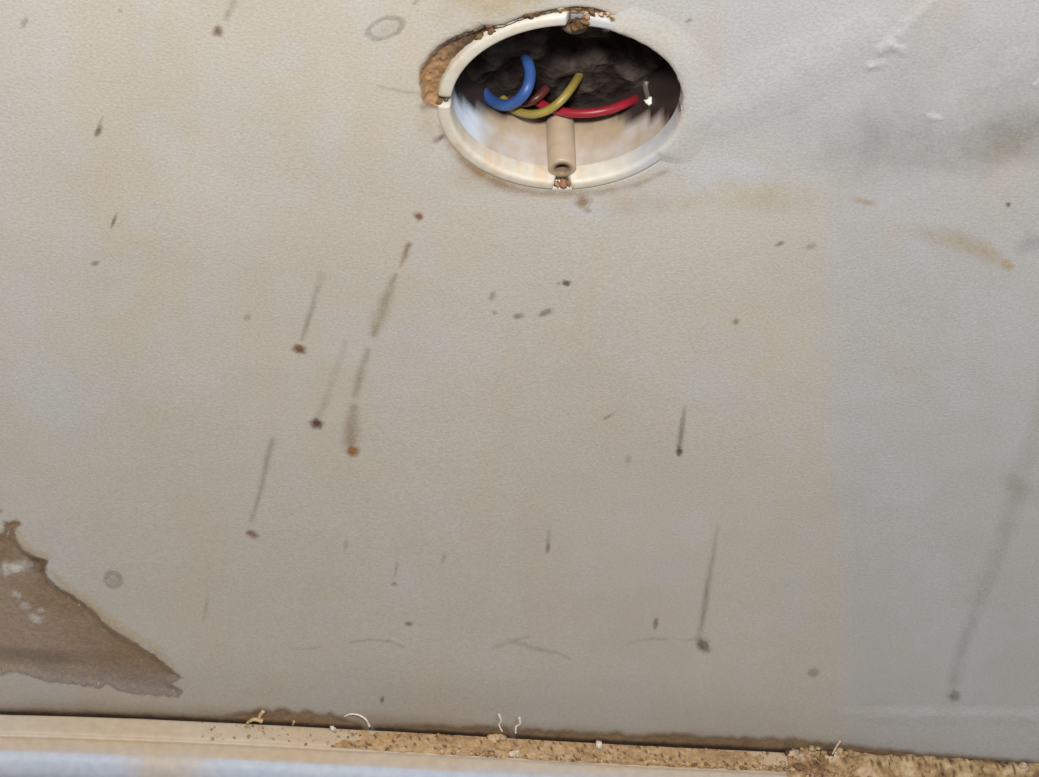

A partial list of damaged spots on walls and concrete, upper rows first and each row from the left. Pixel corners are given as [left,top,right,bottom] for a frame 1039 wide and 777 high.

peeling [0,521,182,697]